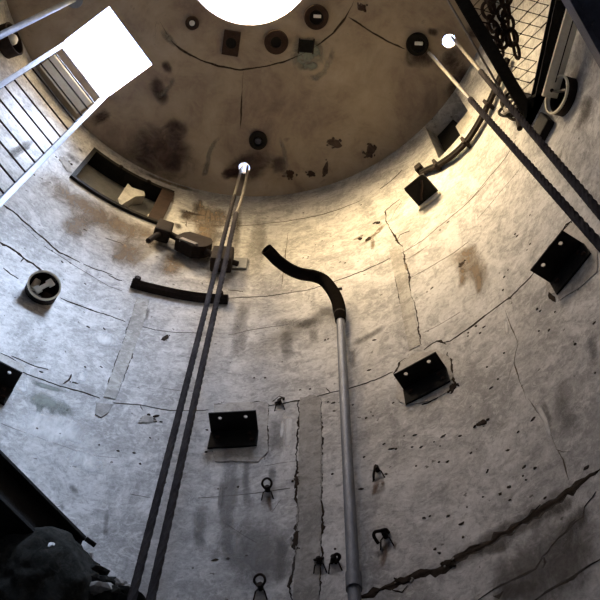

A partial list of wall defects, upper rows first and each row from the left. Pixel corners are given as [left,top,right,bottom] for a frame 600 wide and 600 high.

water stain [133,120,191,190]
spalling [326,137,342,149]
spalling [362,143,377,158]
crack [0,205,122,291]
crack [231,140,516,298]
spalling [95,402,113,418]
crack [361,273,600,600]